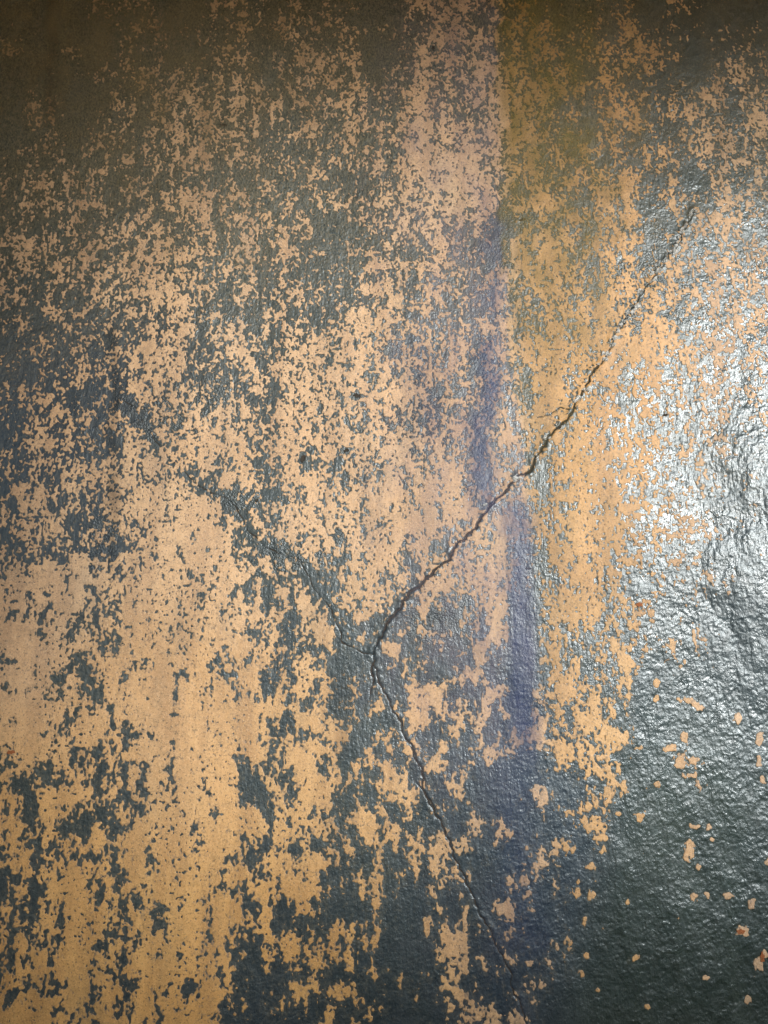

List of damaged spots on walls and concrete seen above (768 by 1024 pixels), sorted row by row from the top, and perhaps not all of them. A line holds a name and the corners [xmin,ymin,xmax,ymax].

crack [125,210,697,1023]
peeling [364,686,385,719]
peeling [662,731,708,793]
peeling [755,732,766,784]
peeling [530,784,554,822]
peeling [491,816,514,847]
peeling [682,823,715,871]
peeling [475,835,576,976]
peeling [552,876,596,901]
peeling [690,892,735,902]
peeling [423,892,531,1024]
peeling [753,949,768,977]